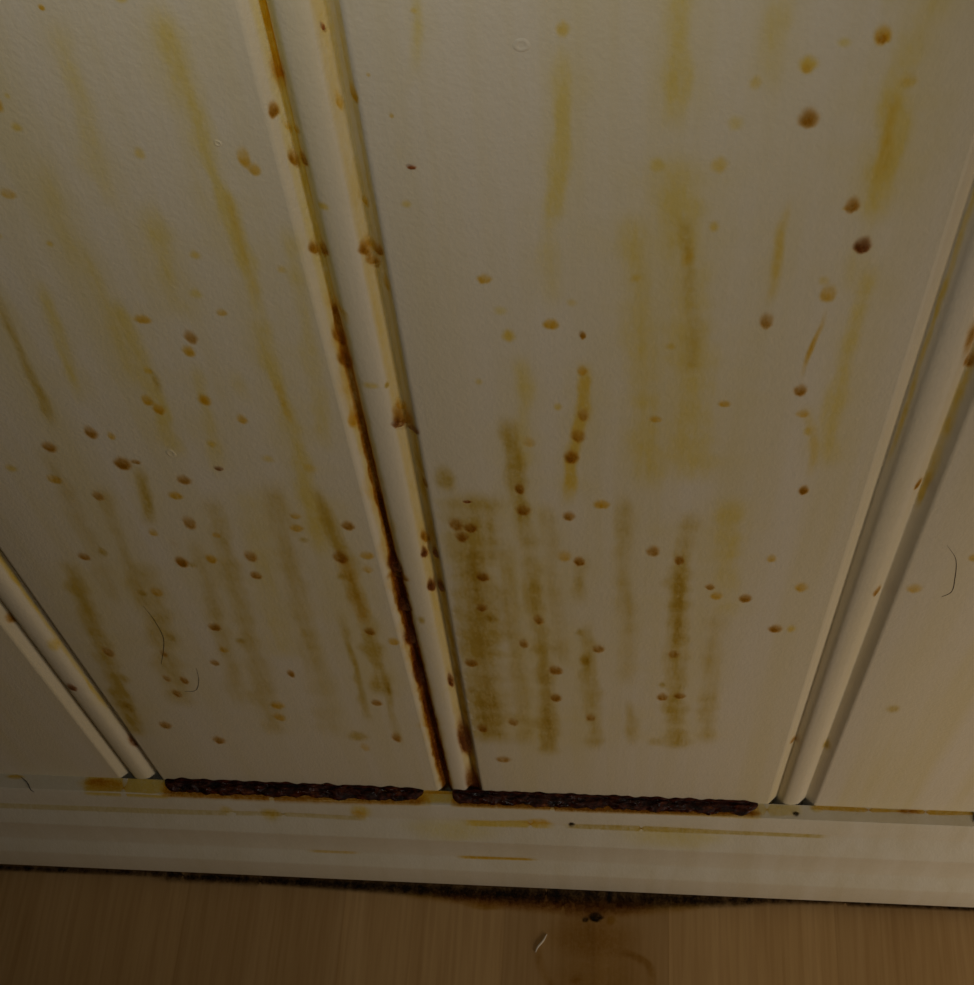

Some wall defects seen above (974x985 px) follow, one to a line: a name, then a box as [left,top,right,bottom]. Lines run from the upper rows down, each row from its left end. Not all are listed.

rust [165,777,424,801]
rust [452,789,758,816]